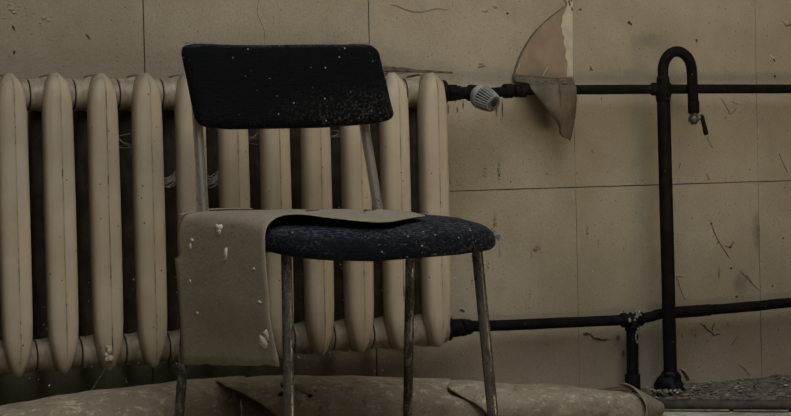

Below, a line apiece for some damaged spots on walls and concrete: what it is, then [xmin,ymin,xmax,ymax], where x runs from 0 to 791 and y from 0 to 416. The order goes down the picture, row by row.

flaking render [561,0,573,78]